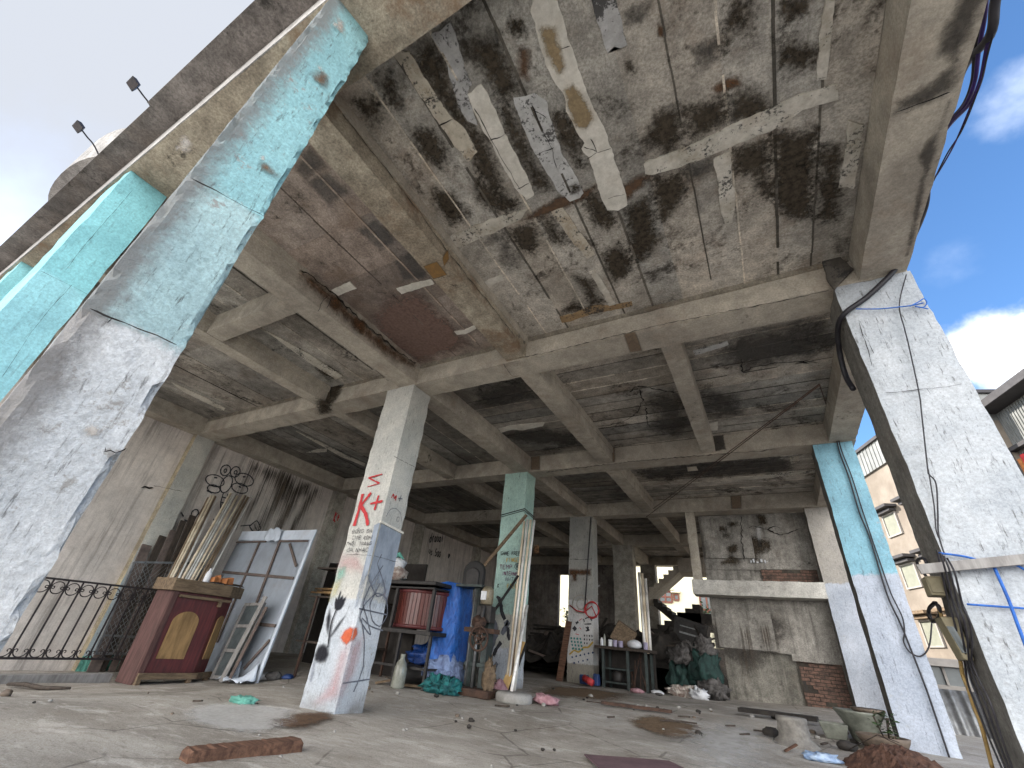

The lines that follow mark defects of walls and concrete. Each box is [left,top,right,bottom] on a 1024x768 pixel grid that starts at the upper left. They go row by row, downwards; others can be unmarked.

damp [776,0,819,72]
damp [412,46,521,227]
damp [463,19,555,193]
damp [550,111,588,169]
damp [648,80,773,154]
damp [731,126,847,223]
damp [490,216,564,268]
damp [582,164,710,282]
corrosion [300,274,467,366]
crack [603,386,681,429]
damp [233,461,318,531]
crack [740,517,798,561]